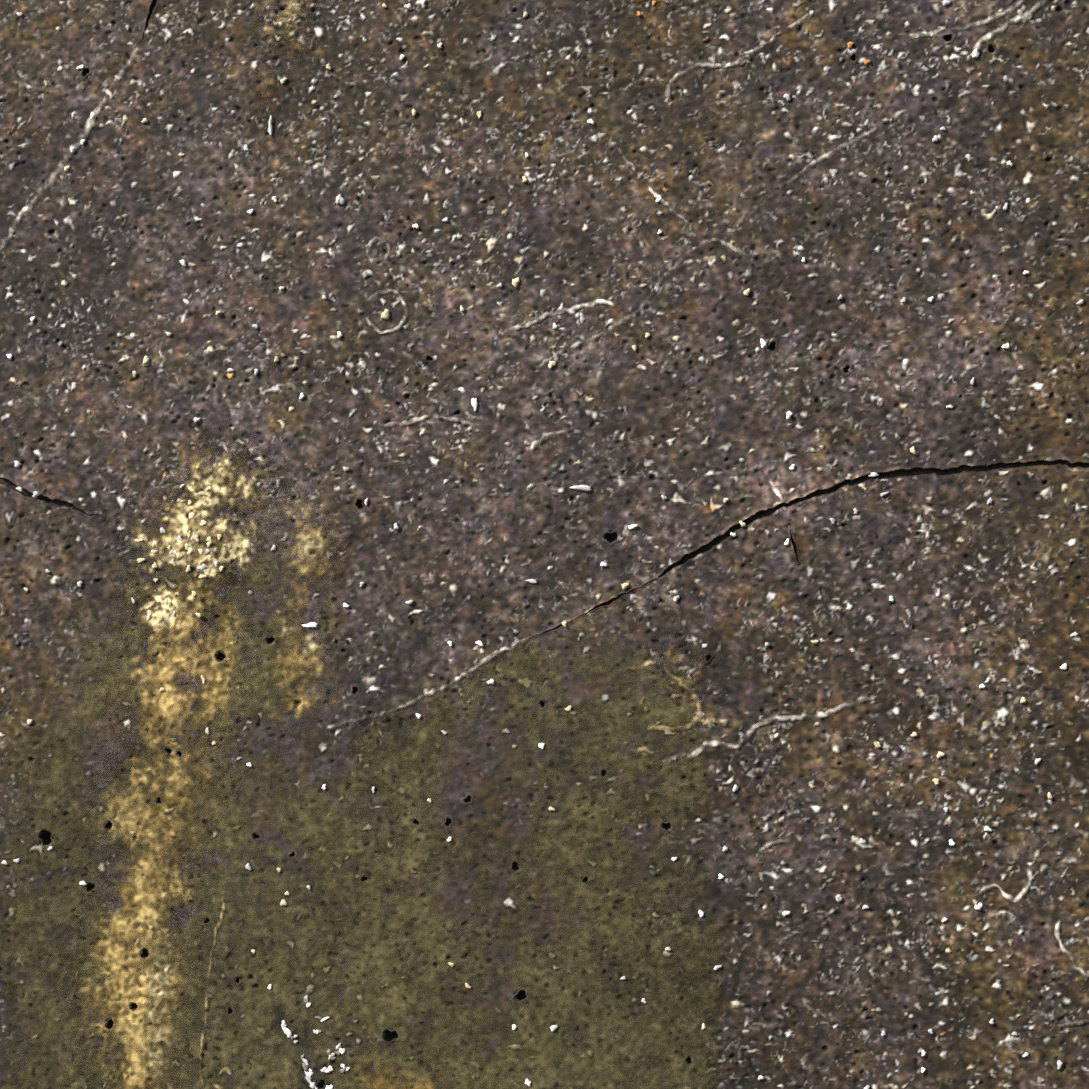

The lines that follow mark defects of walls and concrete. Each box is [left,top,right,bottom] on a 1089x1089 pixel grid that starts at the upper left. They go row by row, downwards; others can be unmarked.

crack [0,473,106,521]
damp [297,532,324,574]
crack [399,456,1089,708]
damp [276,620,320,677]
damp [285,692,308,710]
crack [629,661,874,761]
damp [94,458,253,1089]